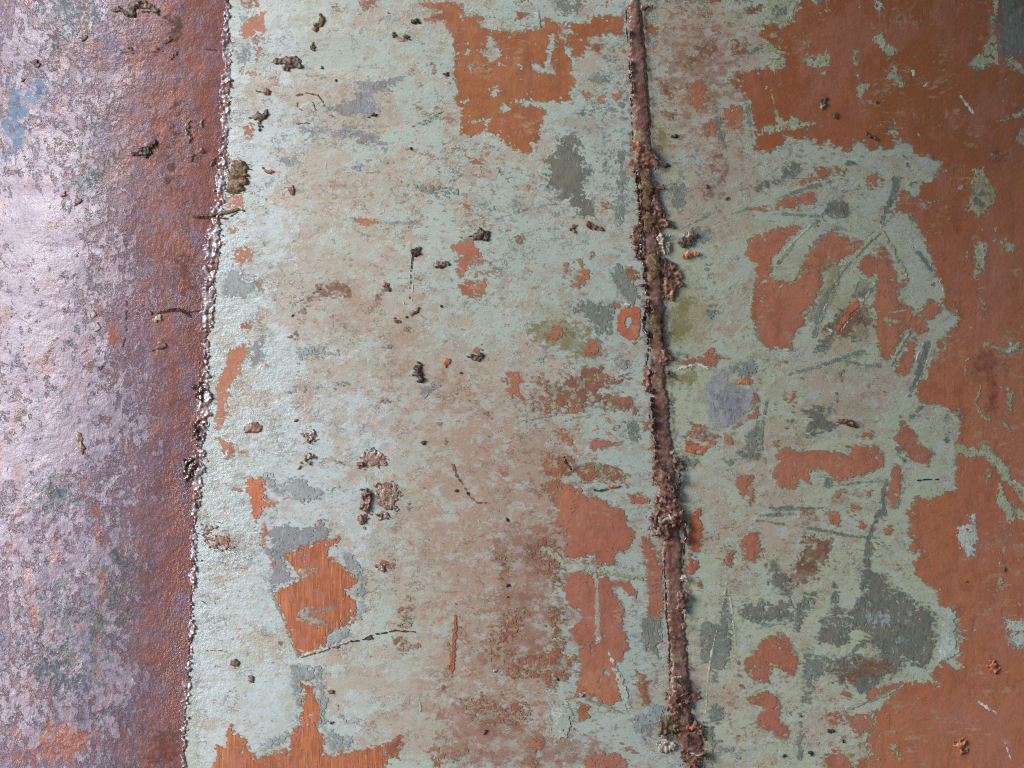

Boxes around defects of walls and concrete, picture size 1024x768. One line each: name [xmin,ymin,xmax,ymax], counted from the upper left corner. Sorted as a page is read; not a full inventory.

peeling [358,0,1024,768]
peeling [231,472,367,620]
peeling [259,612,370,767]